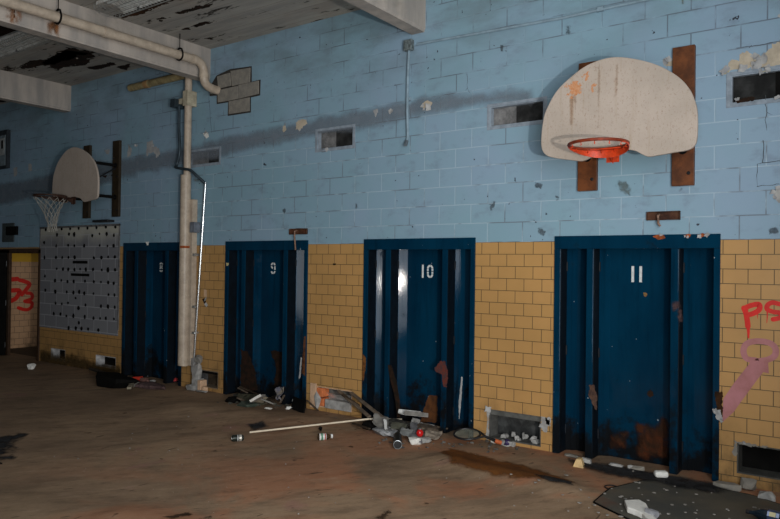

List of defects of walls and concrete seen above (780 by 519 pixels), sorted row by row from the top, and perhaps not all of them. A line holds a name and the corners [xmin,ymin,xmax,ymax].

peeling [719,42,780,75]
rust [435,361,448,388]
rust [588,385,597,410]
rust [611,418,669,458]